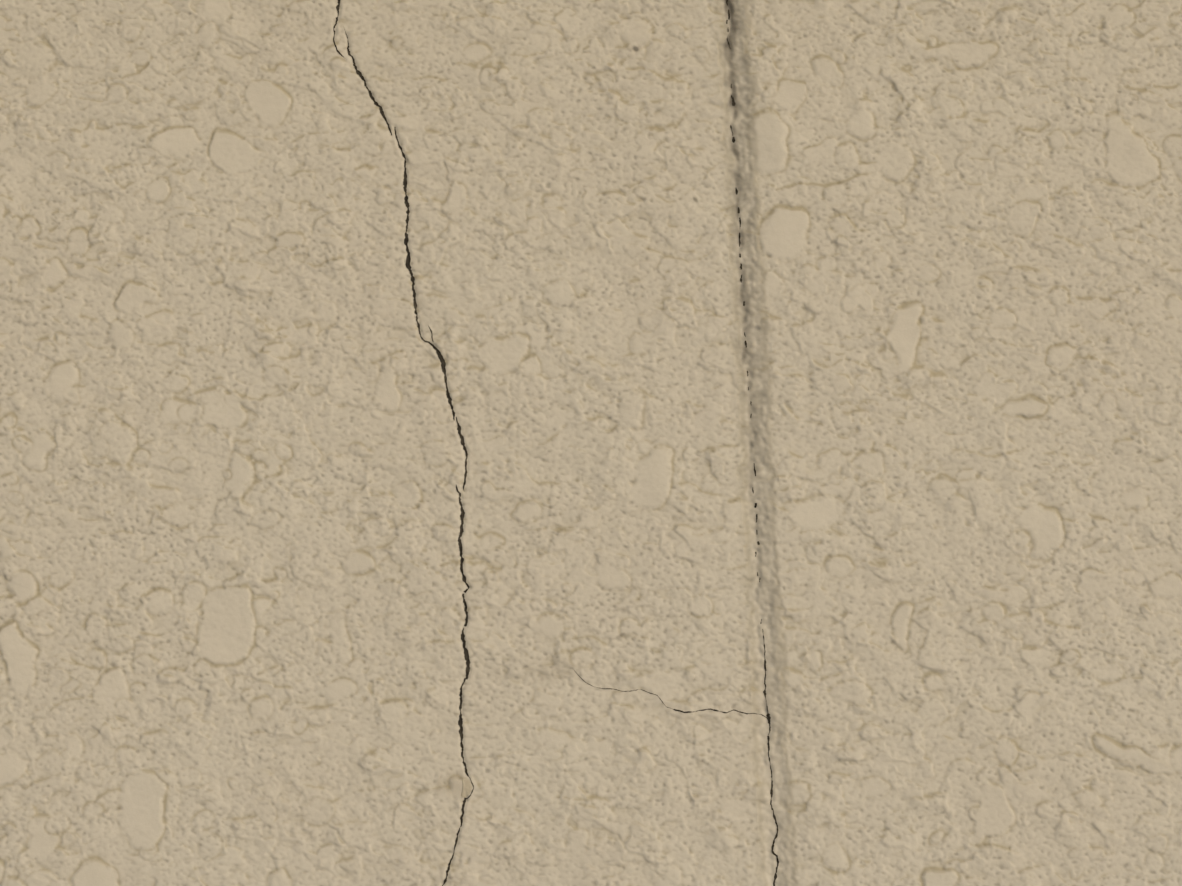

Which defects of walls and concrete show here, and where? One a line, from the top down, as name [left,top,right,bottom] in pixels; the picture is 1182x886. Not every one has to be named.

crack [729,84,737,143]
crack [735,188,752,418]
crack [333,0,474,886]
crack [752,464,760,582]
crack [573,619,779,886]